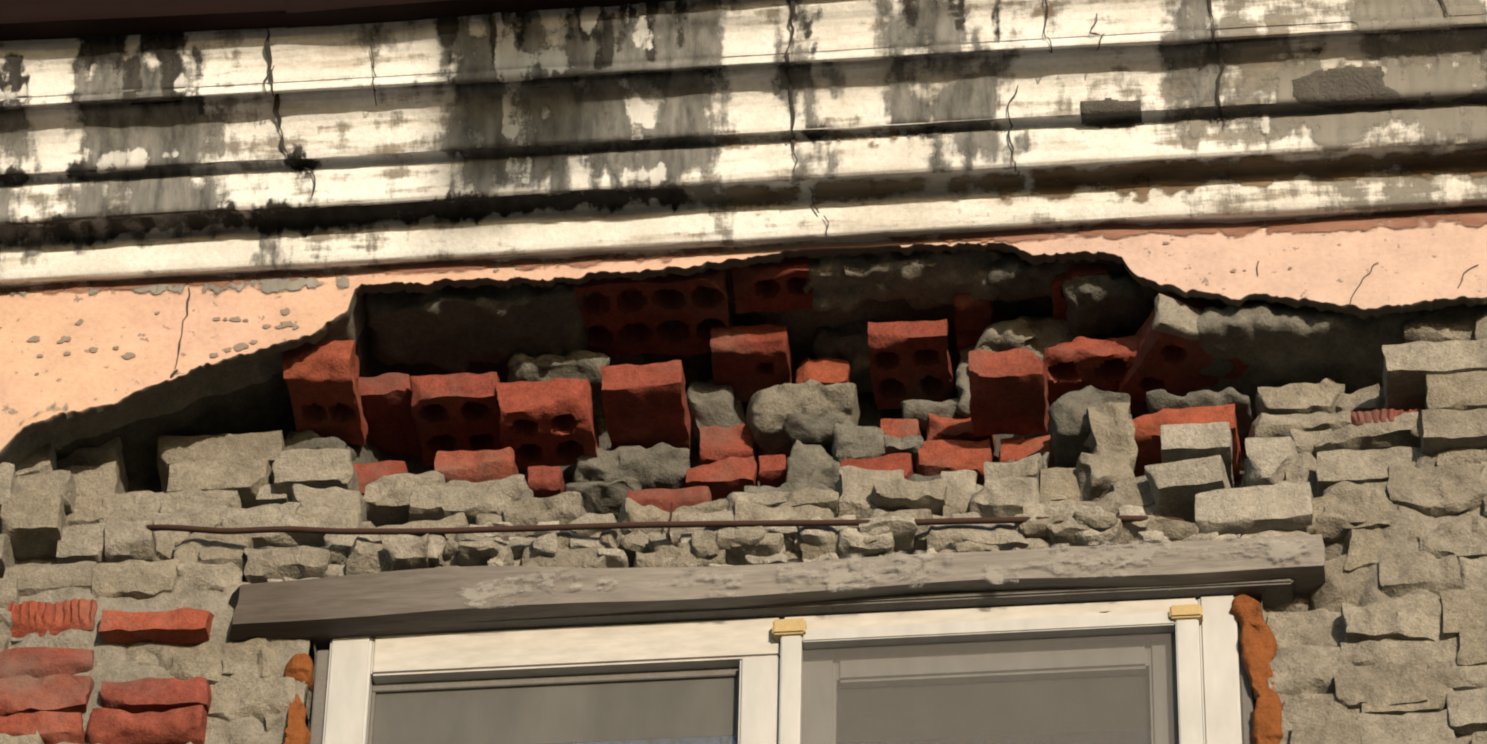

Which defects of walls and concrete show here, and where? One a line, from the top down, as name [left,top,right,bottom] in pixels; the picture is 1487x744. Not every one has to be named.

crack [263,26,316,196]
damp [0,0,1029,270]
spalling [1080,98,1144,128]
crack [1208,0,1225,127]
damp [1158,0,1487,152]
spalling [1291,48,1487,110]
peeling [27,319,84,375]
crack [170,287,190,378]
peeling [133,274,349,357]
spalling [55,370,435,493]
spalling [355,249,1157,522]
spalling [992,303,1422,488]